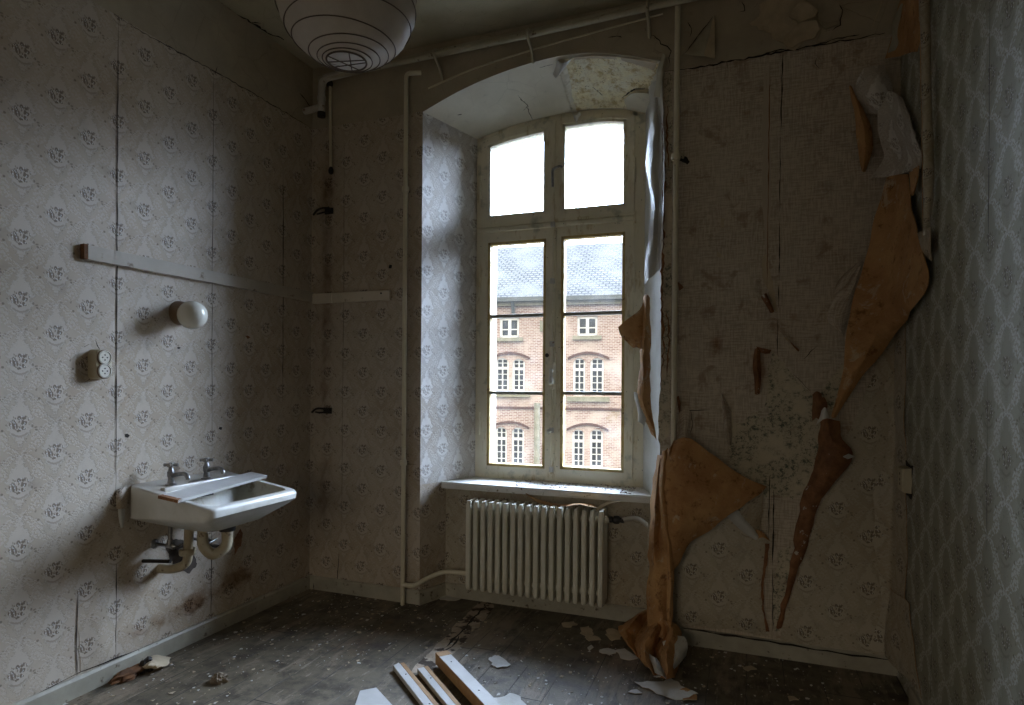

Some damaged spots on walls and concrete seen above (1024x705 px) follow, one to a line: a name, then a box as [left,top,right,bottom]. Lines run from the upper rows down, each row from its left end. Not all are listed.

flaking render [553,53,690,445]
damp [727,352,844,499]